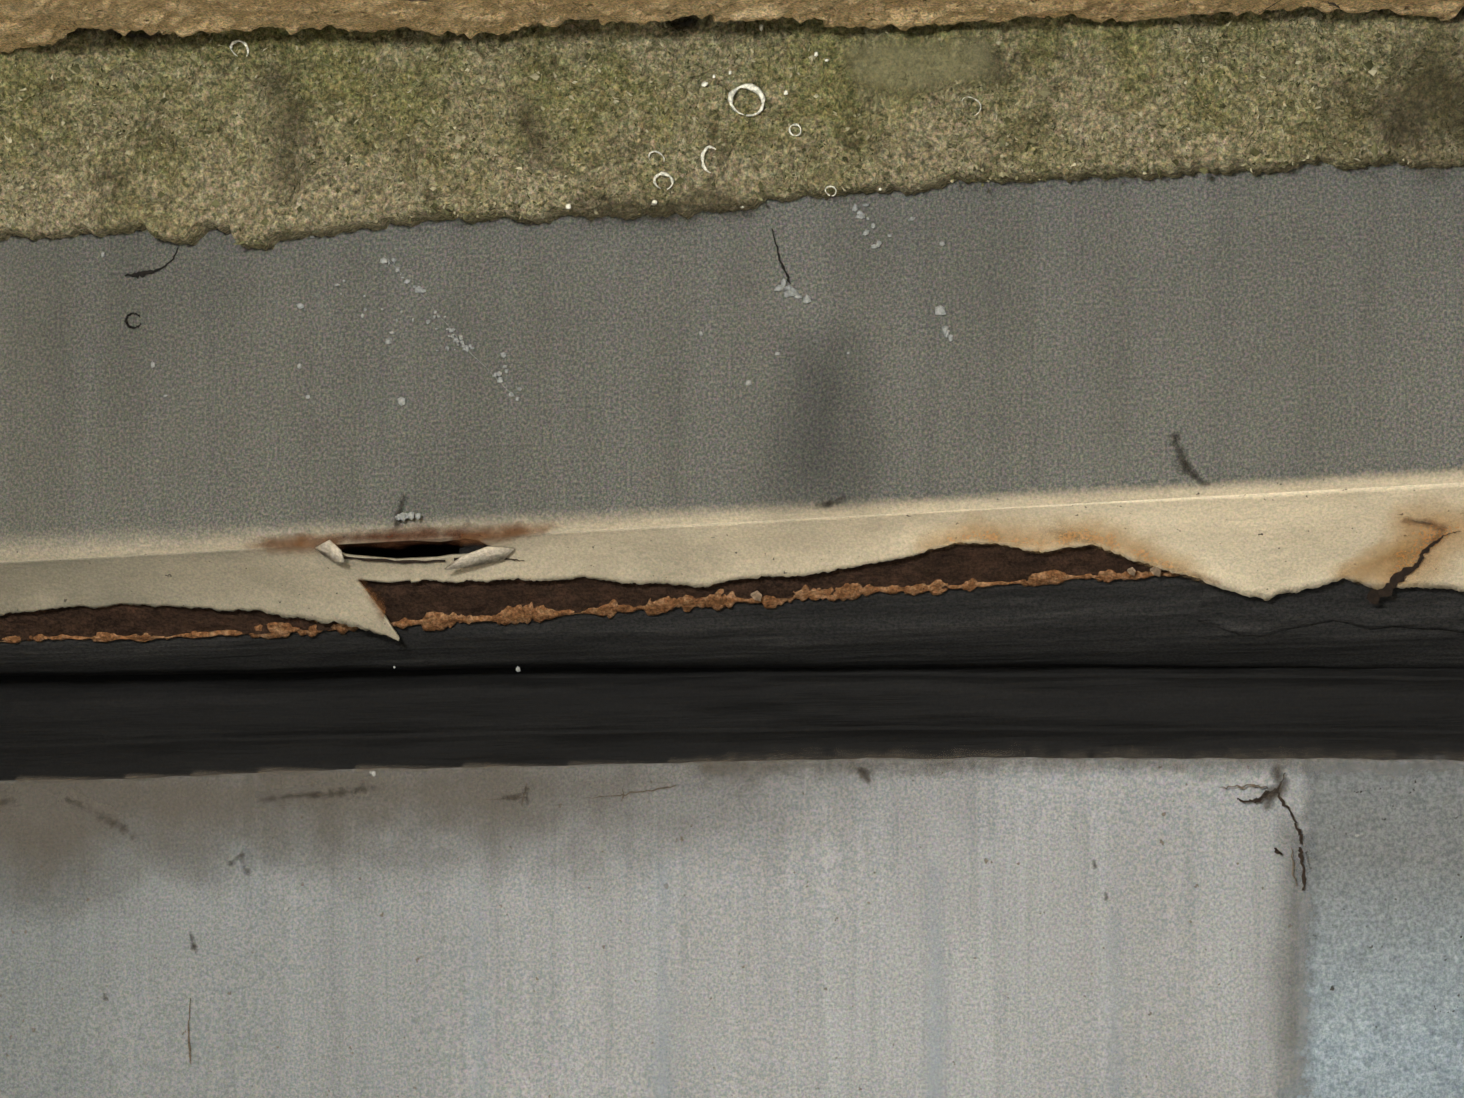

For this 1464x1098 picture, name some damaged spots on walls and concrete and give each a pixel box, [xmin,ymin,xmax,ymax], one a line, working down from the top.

peeling [0,604,359,643]
peeling [359,542,1186,631]
corrosion [943,528,1178,568]
peeling [1198,578,1464,636]
crack [1356,520,1461,604]
crack [1219,767,1309,891]